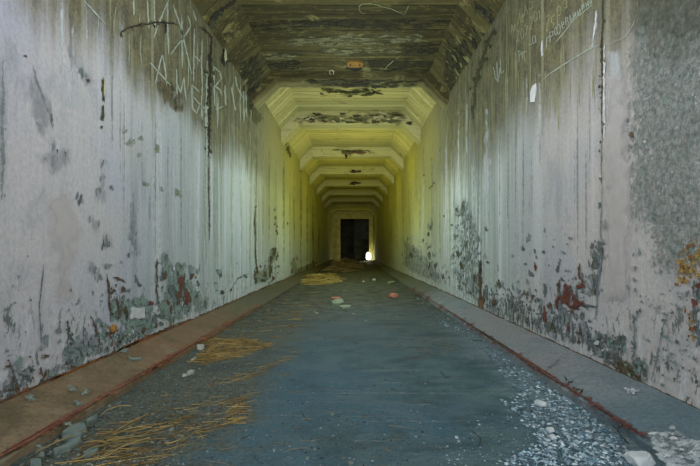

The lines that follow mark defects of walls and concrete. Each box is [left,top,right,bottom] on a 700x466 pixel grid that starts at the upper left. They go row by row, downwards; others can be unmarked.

rust [157,80,183,112]
peeling [282,34,430,57]
water stain [431,131,491,264]
peeling [0,350,35,403]
peeling [63,252,209,369]
rust [0,267,311,403]
peeling [254,247,280,284]
peeling [402,198,626,367]
rust [406,261,700,438]
peeling [691,278,700,348]